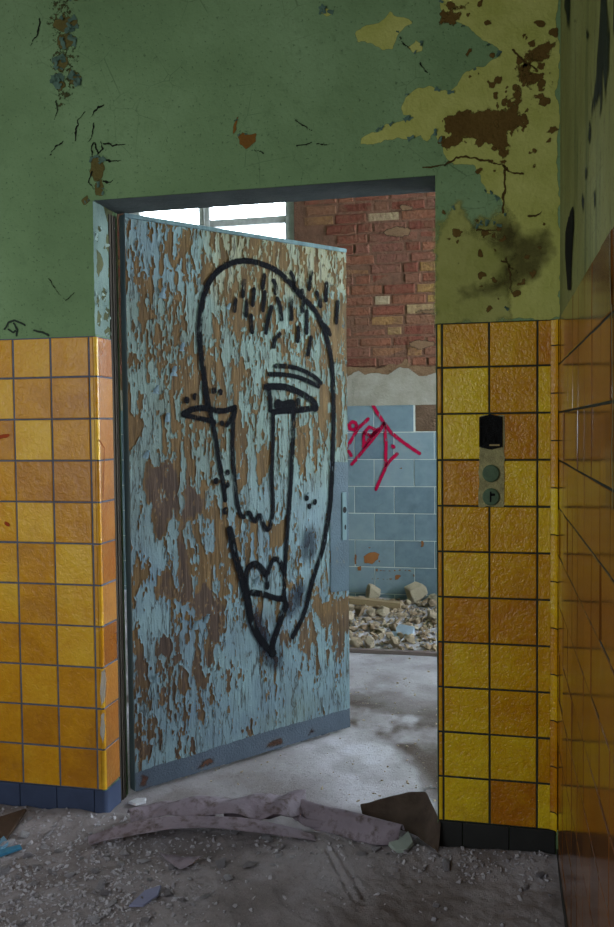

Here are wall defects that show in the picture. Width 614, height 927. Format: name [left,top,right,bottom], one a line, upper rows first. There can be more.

water stain [438,0,570,174]
crack [512,49,537,70]
crack [50,100,125,186]
flaking render [81,154,107,205]
crack [422,155,524,231]
water stain [476,219,545,313]
peeling [95,0,574,789]